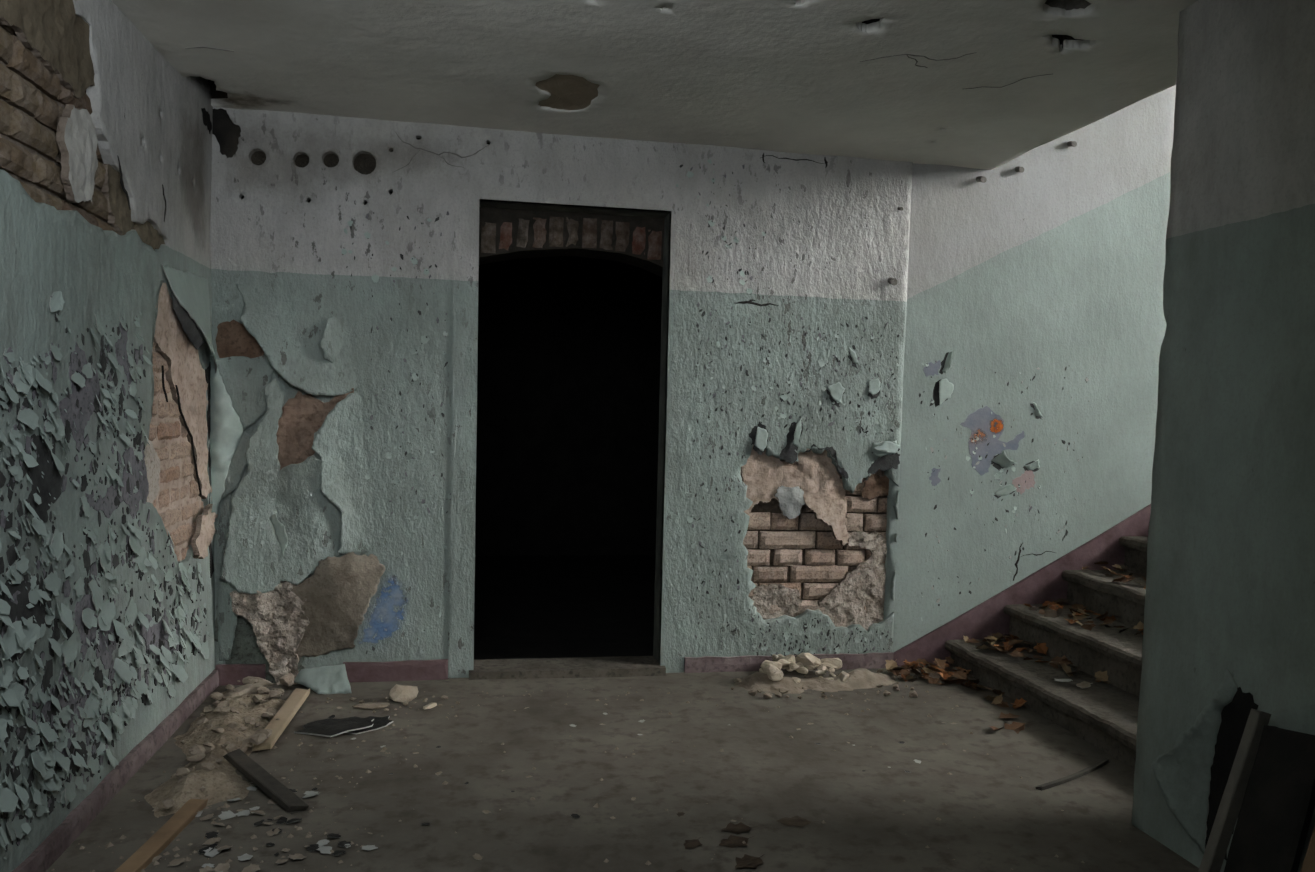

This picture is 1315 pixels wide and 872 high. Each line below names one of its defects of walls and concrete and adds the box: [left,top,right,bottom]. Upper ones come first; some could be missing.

flaking render [0,0,165,251]
spalling [201,79,241,158]
spalling [535,74,600,110]
crack [860,52,1051,89]
spalling [1052,34,1081,48]
spalling [1044,0,1091,11]
flaking render [685,302,901,656]
peeling [919,351,1054,533]
peeling [0,207,449,860]